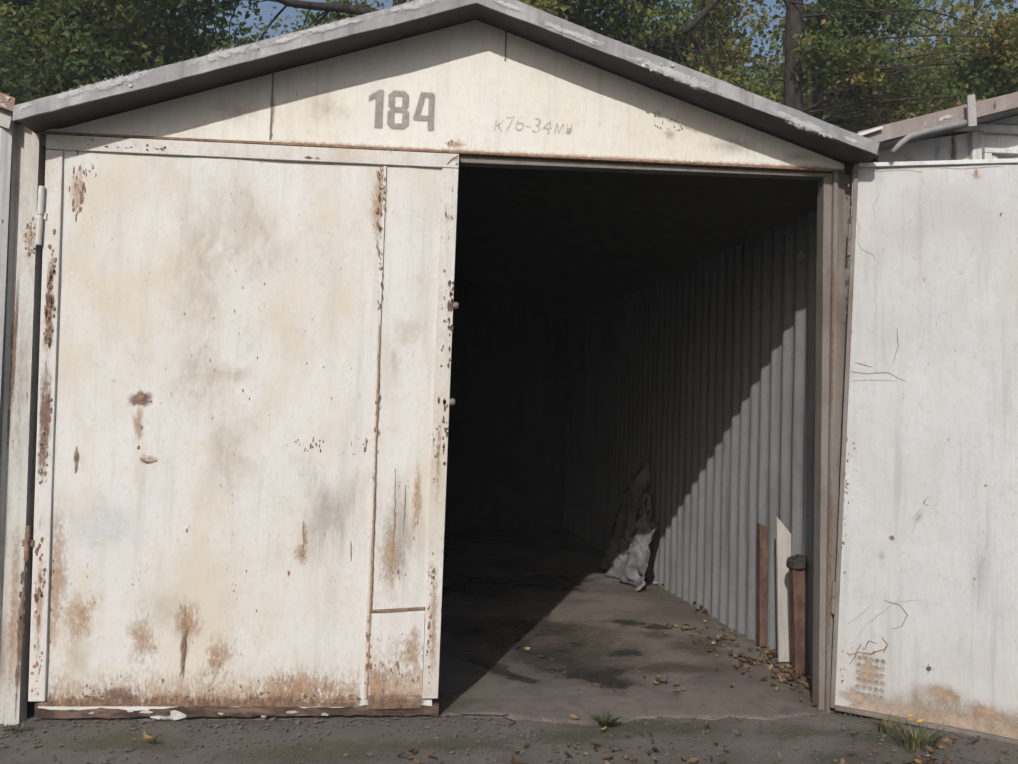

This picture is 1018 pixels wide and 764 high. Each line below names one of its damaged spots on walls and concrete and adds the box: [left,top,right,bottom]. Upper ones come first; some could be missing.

corrosion [373,167,386,310]
crack [856,166,1002,259]
crack [851,330,906,382]
corrosion [15,325,435,712]
crack [840,600,917,683]
corrosion [845,686,1018,738]